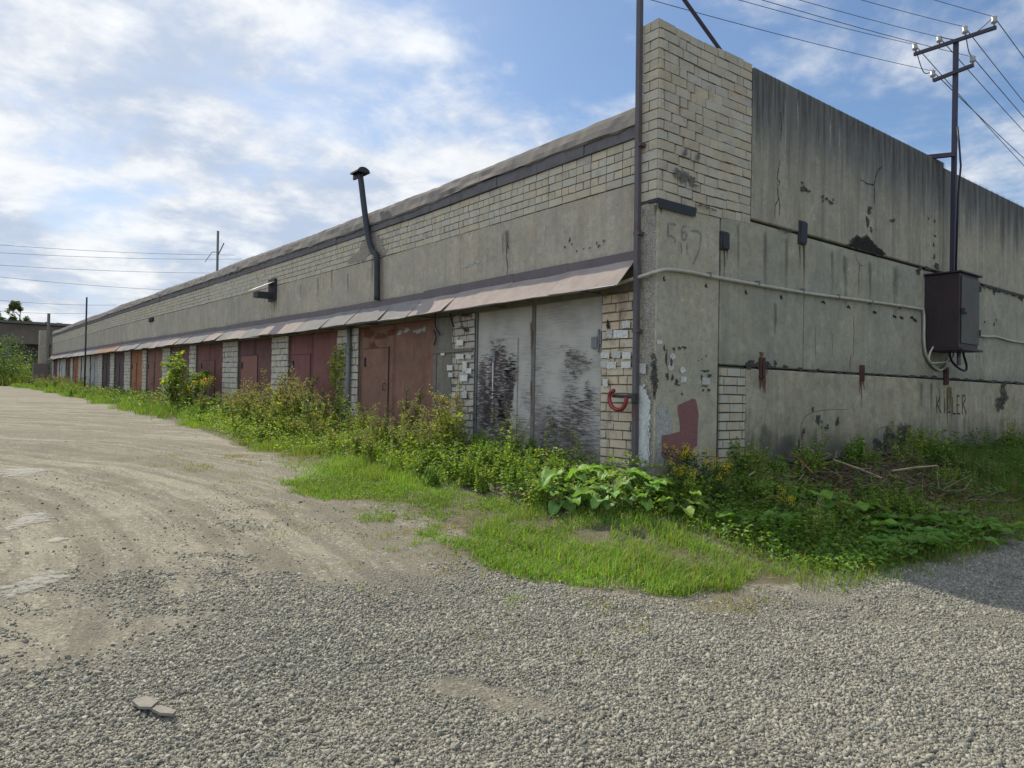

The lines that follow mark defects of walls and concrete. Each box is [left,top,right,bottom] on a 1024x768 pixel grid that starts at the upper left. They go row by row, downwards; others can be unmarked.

spalling [847,206,886,256]